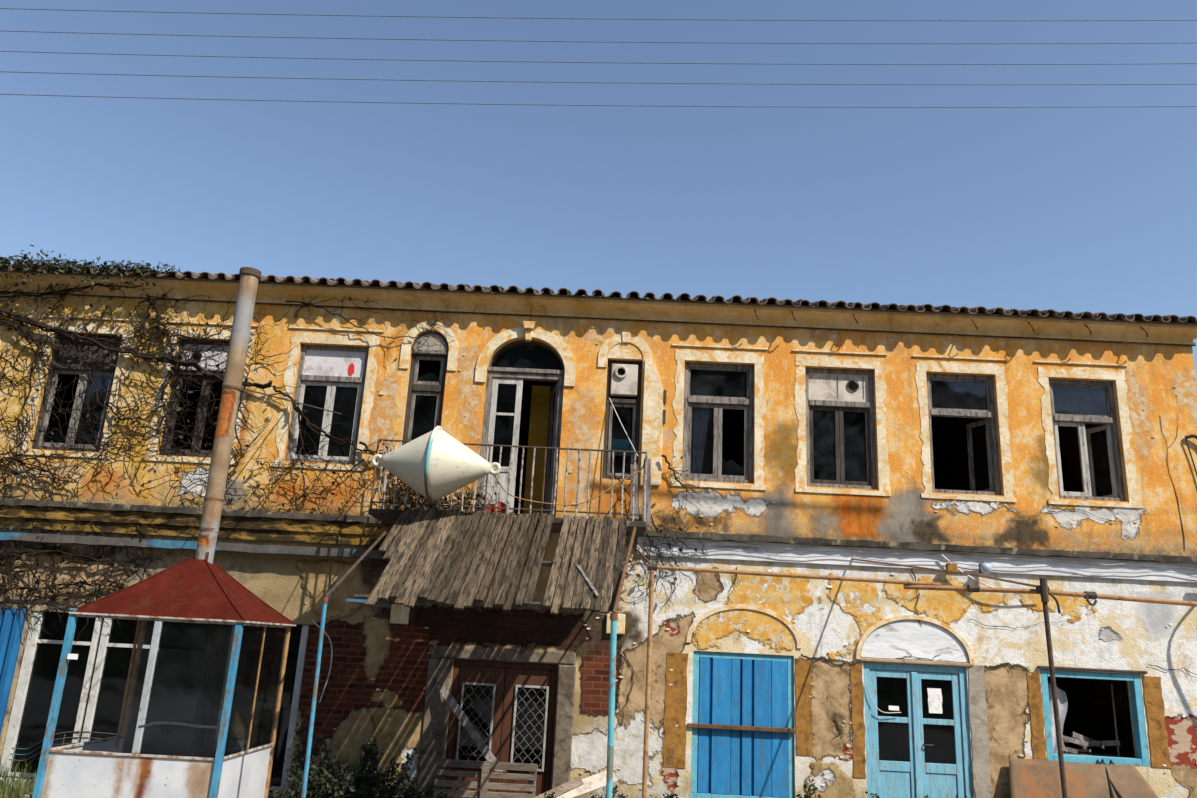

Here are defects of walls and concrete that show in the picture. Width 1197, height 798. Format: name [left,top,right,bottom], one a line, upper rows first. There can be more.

peeling [174,465,209,503]
peeling [657,488,776,527]
water stain [878,487,949,544]
peeling [931,494,1017,515]
water stain [995,516,1049,548]
peeling [1040,500,1146,540]
peeling [663,570,1097,660]
flaking render [296,559,681,794]
crack [621,651,641,726]
corrosion [135,757,152,798]
peeling [804,713,856,798]
flaking render [1163,713,1197,773]